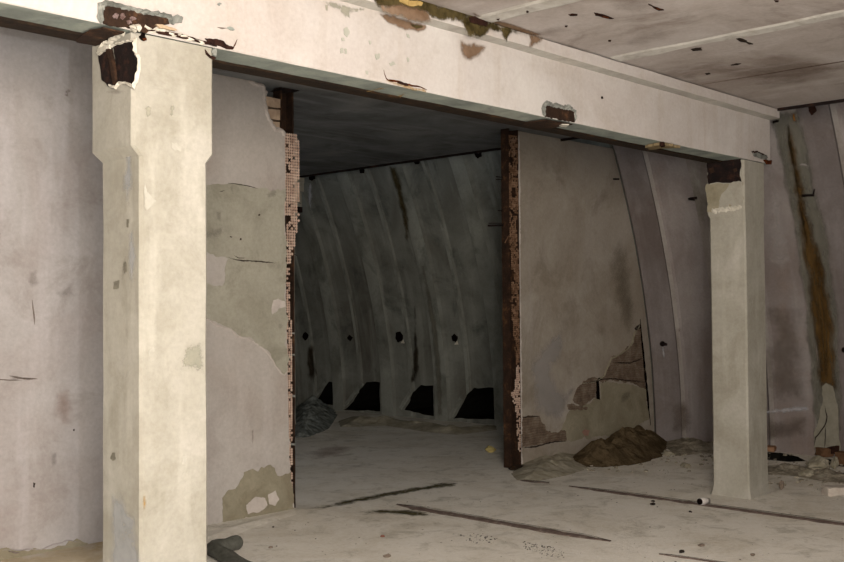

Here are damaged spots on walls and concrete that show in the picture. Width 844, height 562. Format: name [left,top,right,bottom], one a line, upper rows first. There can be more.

spalling [76,0,205,89]
spalling [523,100,577,129]
spalling [712,205,742,214]
peeling [206,183,289,376]
corrosion [788,127,835,387]
flaking render [521,324,650,448]
peeling [222,465,294,522]